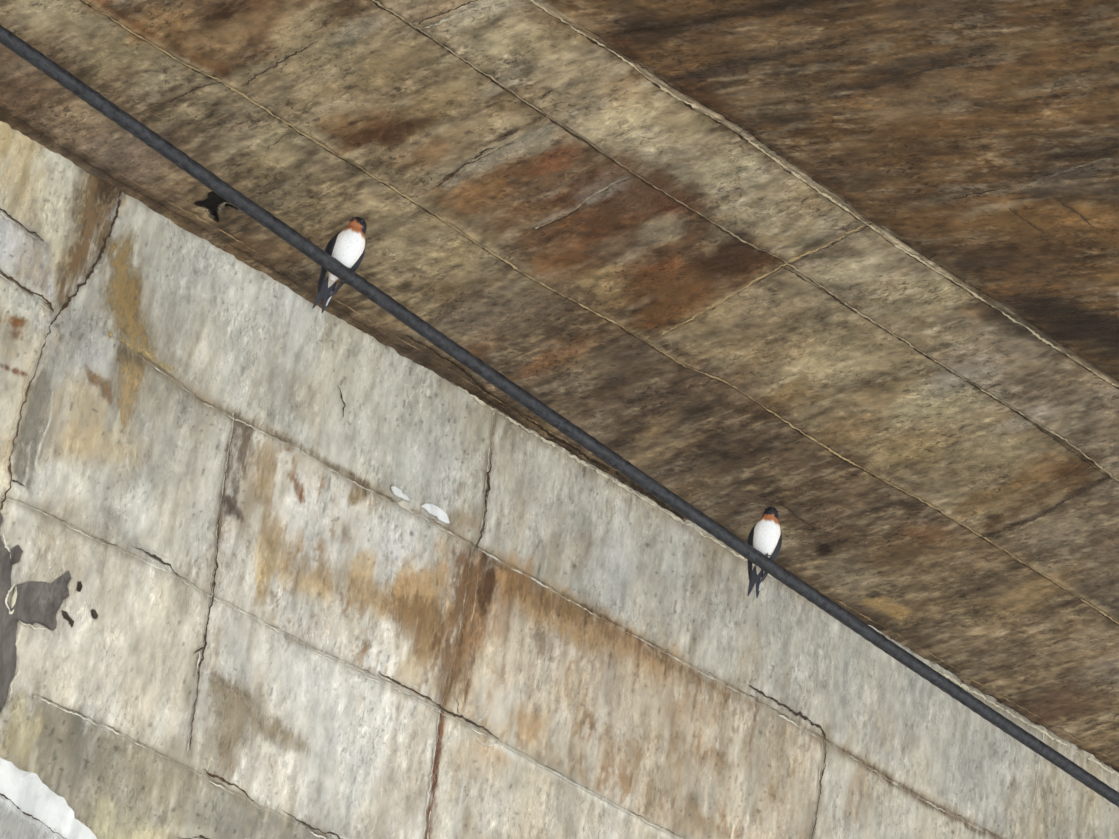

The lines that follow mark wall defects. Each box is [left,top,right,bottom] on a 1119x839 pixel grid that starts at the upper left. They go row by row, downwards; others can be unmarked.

crack [419,0,503,28]
peeling [391,486,450,524]
crack [131,545,178,575]
crack [190,425,235,746]
spalling [0,513,82,713]
crack [379,671,500,739]
peeling [0,757,97,839]
crack [204,769,254,801]
crack [285,812,340,839]